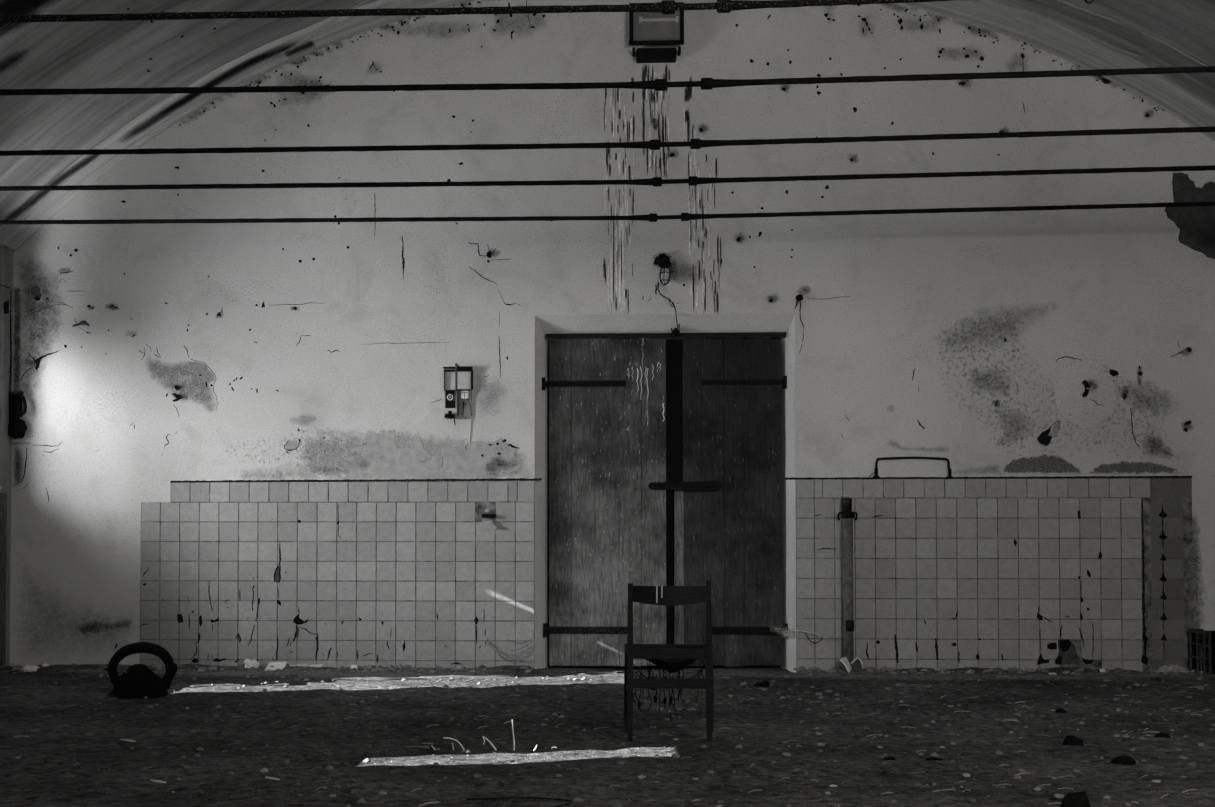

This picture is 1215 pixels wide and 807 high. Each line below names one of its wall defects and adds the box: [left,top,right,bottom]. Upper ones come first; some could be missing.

leakage [603,65,722,313]
spalling [1164,172,1215,261]
peeling [64,304,218,417]
peeling [278,428,524,480]
leakage [1004,426,1174,474]